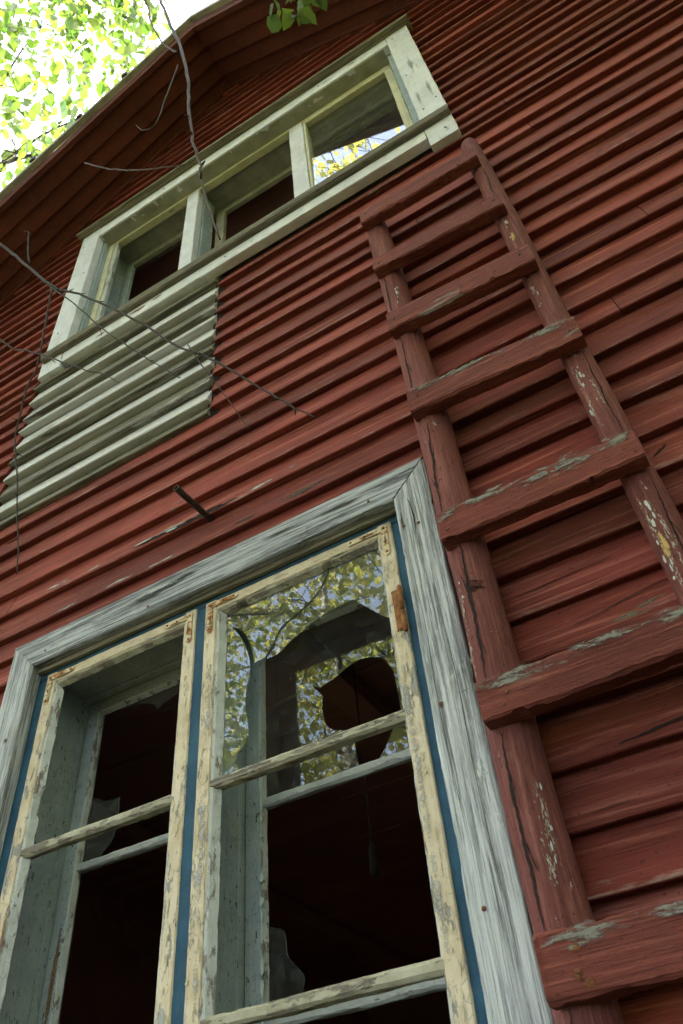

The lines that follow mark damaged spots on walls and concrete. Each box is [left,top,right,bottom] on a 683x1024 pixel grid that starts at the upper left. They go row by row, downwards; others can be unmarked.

peeling [638,500,683,587]
crack [500,732,544,929]
peeling [532,783,561,885]
peeling [44,923,62,1024]